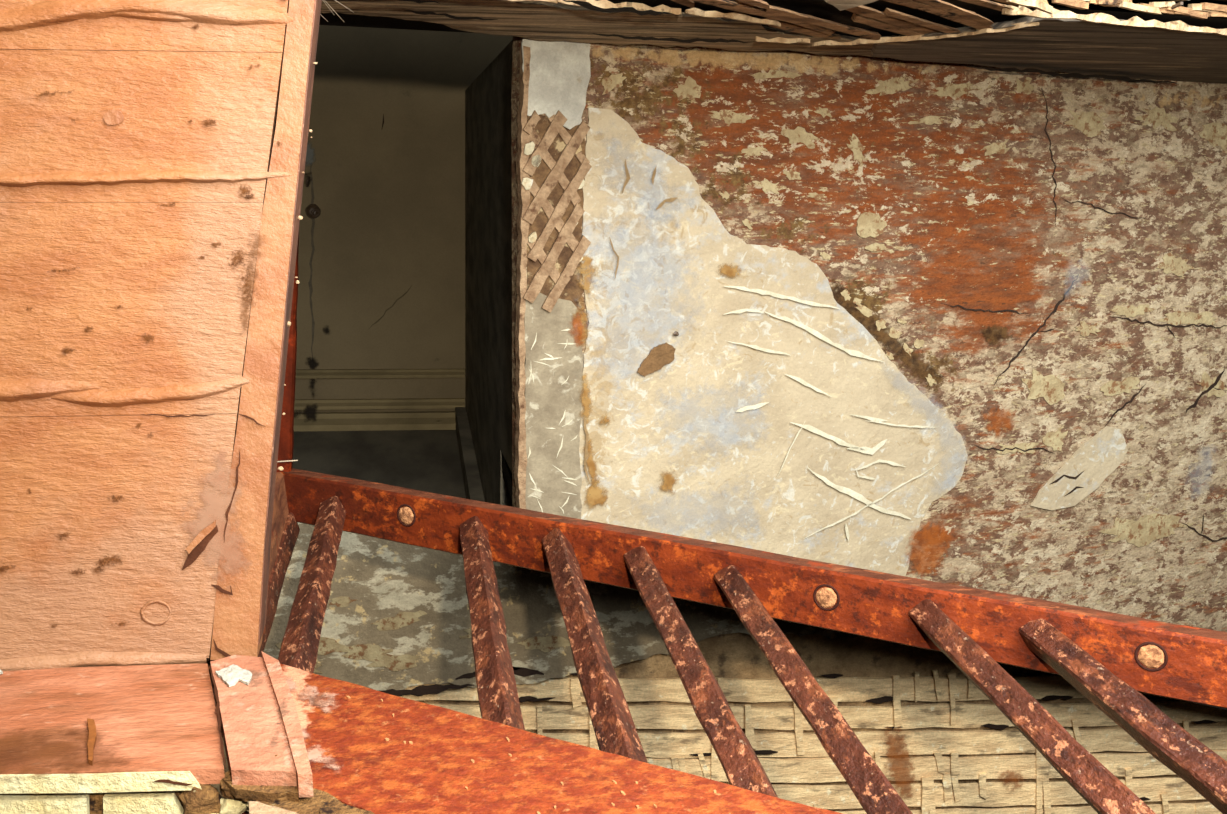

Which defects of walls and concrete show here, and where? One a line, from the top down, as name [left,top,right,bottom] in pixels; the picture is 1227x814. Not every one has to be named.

crack [563,0,758,43]
peeling [935,83,983,97]
peeling [980,139,1009,156]
crack [962,65,1177,225]
peeling [1064,109,1107,137]
peeling [1135,107,1180,131]
peeling [514,46,968,576]
crack [941,274,1079,385]
crack [1110,316,1227,337]
crack [1186,366,1225,412]
crack [224,451,240,543]
corrosion [907,523,951,576]